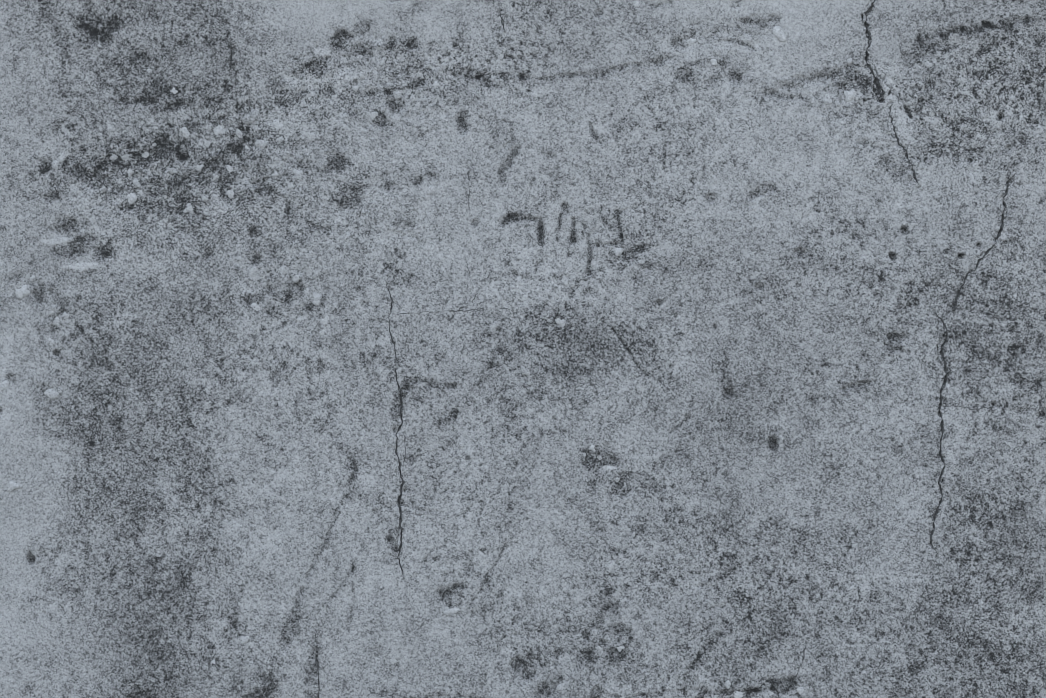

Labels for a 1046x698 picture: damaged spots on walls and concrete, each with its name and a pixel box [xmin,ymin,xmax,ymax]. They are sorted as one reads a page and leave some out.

crack [862,0,921,187]
crack [358,253,516,614]
crack [911,171,1027,660]